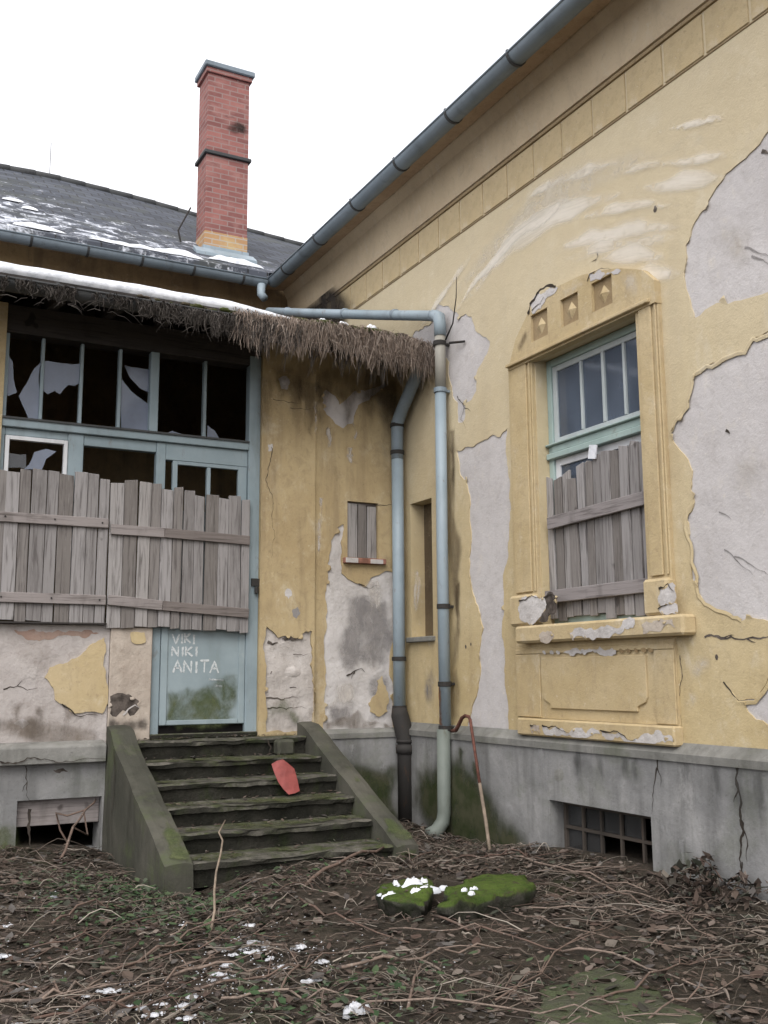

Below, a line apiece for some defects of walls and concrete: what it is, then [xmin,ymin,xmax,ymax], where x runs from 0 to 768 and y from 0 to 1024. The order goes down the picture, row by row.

flaking render [684,133,768,318]
flaking render [527,284,558,314]
flaking render [320,382,387,428]
flaking render [413,304,490,423]
flaking render [669,332,768,621]
flaking render [263,525,393,732]
damp [343,581,392,666]
flaking render [458,430,511,729]
flaking render [518,583,678,656]
crack [704,634,768,643]
flaking render [530,725,674,744]
crack [734,768,748,892]